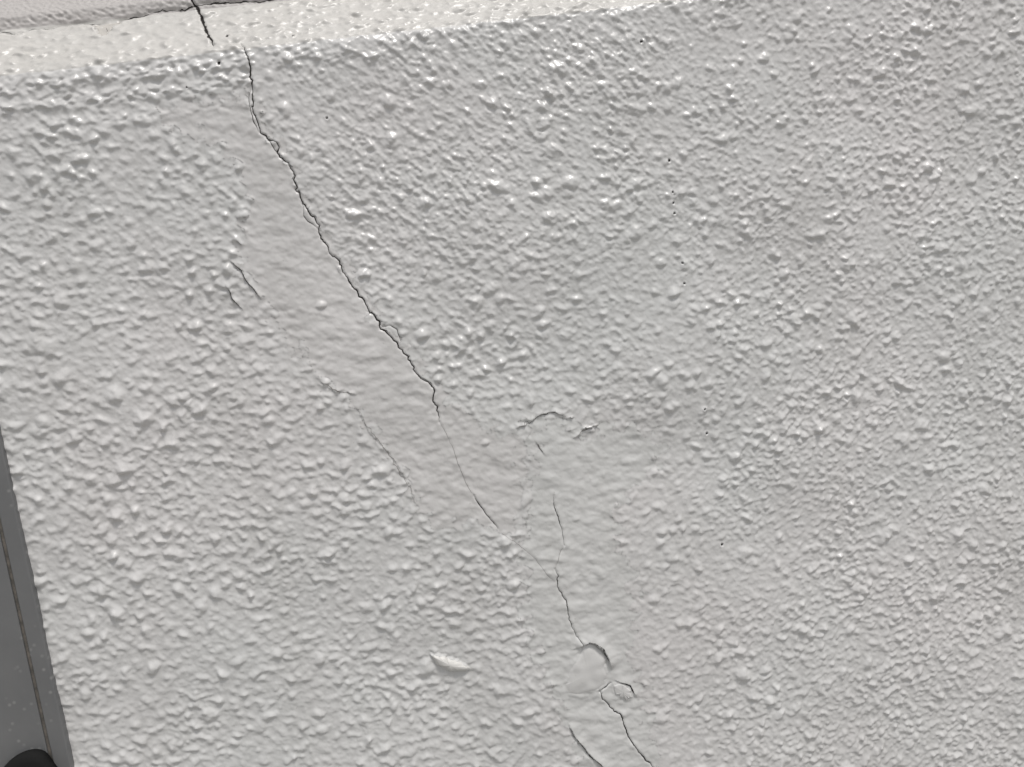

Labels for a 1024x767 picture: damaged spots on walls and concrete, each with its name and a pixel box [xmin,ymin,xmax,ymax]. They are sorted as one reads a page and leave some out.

crack [128,0,272,46]
crack [242,46,583,644]
crack [601,686,653,767]